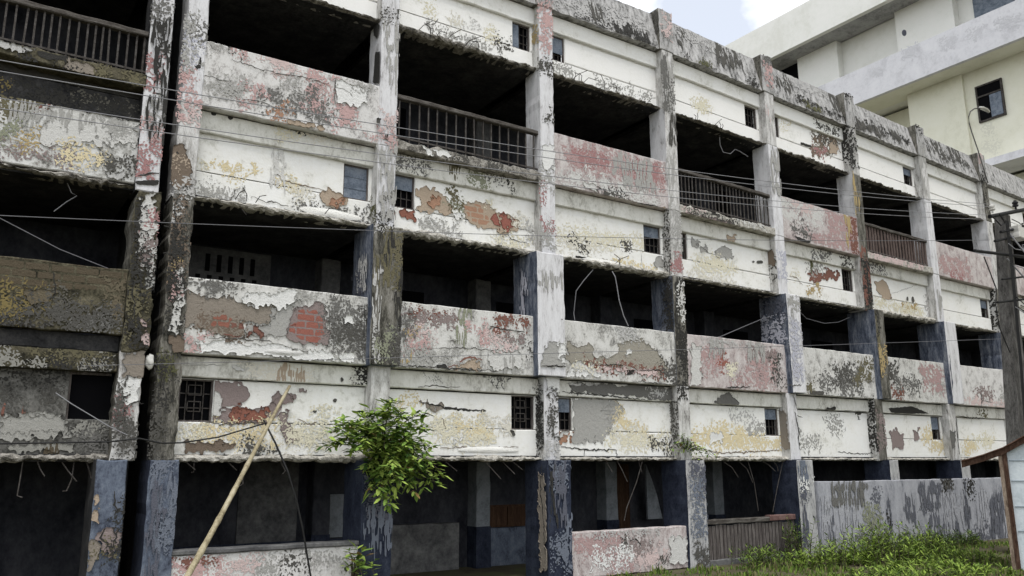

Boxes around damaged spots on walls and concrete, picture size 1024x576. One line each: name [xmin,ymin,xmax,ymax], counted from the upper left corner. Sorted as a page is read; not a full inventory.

spalling [87,494,122,572]
water stain [0,193,342,576]
flaking render [168,272,331,353]
water stain [0,0,516,454]
spalling [149,379,367,487]
spalling [0,87,538,273]
peeling [230,48,399,153]
peeling [401,305,531,357]
flaking render [405,338,678,576]
water stain [483,1,1008,567]
spalling [559,205,936,405]
spalling [675,113,995,230]